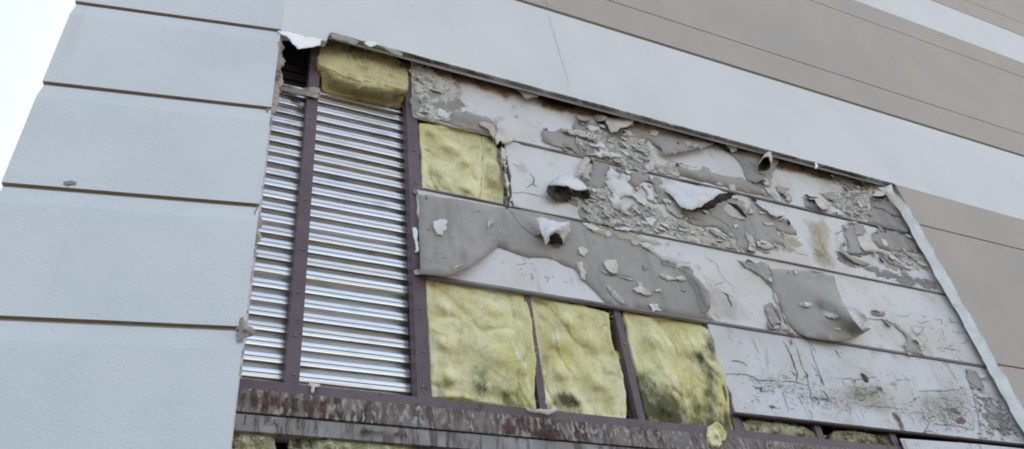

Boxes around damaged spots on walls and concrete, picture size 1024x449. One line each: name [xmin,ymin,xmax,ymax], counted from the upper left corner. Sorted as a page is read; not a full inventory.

flaking render [329,33,403,57]
peeling [409,64,513,145]
peeling [418,117,937,357]
crack [729,265,1018,440]
corrosion [236,388,850,449]
peeling [950,368,1018,437]